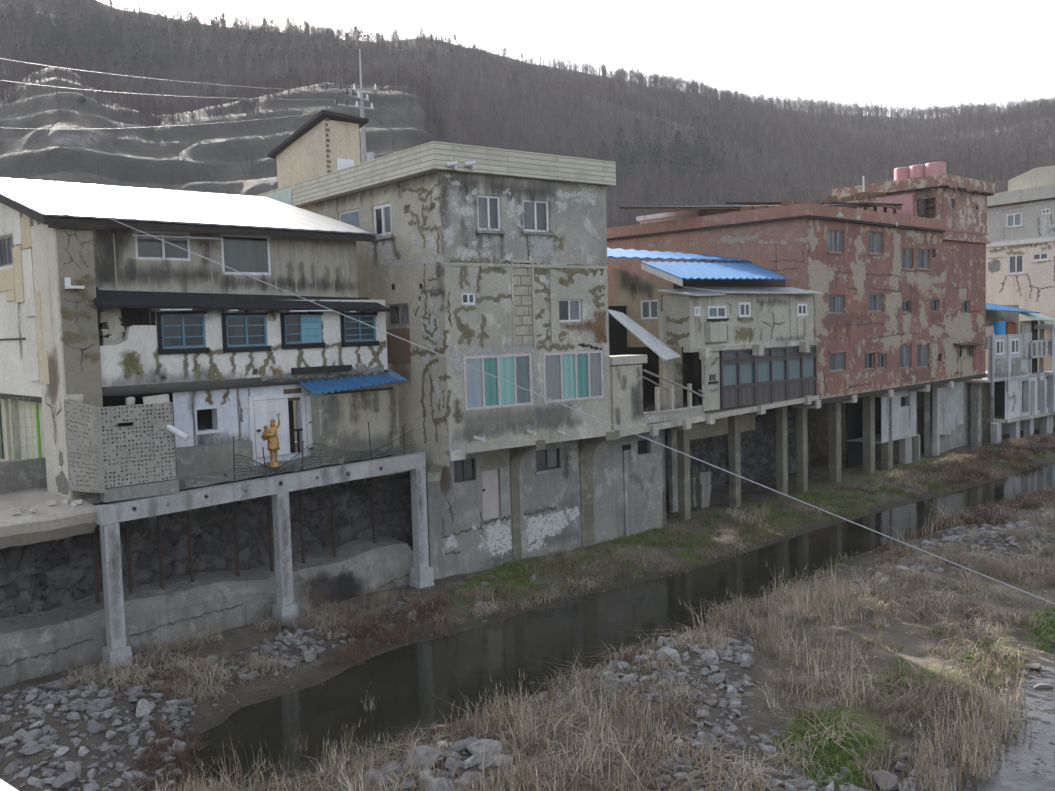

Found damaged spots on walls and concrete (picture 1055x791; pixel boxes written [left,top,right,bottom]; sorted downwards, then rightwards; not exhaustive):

peeling [443,174,480,204]
damp [96,229,353,289]
crack [989,206,1055,301]
crack [62,229,99,370]
crack [153,181,605,443]
peeling [647,215,985,399]
damp [112,352,241,396]
damp [261,363,409,382]
peeling [566,506,579,521]